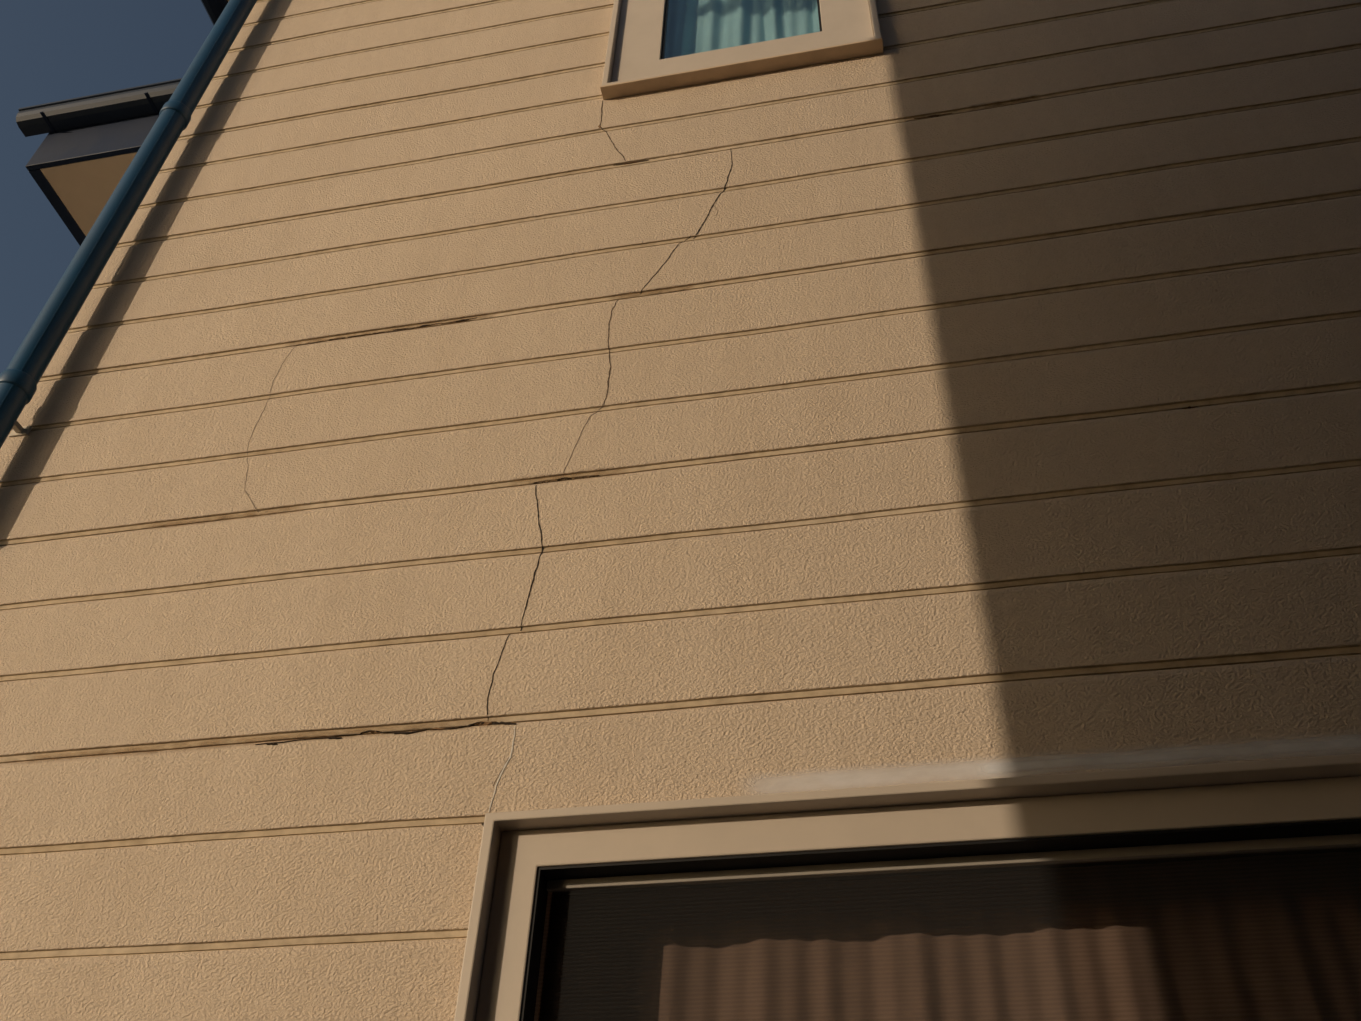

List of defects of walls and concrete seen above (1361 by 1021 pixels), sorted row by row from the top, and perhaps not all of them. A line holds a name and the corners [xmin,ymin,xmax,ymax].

crack [598,100,626,161]
crack [244,346,297,512]
crack [487,152,733,812]